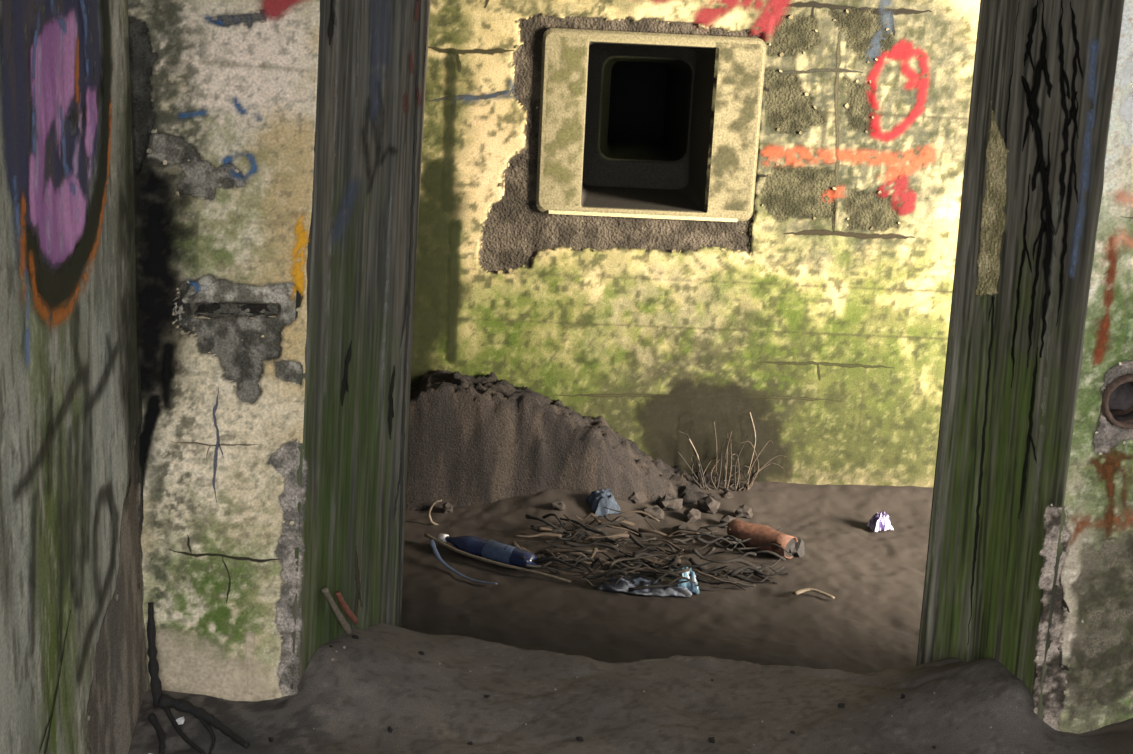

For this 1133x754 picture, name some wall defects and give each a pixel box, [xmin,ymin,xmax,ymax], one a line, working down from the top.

peeling [128,16,246,200]
spalling [479,9,900,274]
damp [122,142,174,510]
spalling [174,275,303,404]
spalling [267,438,308,697]
crack [967,0,1083,645]
peeling [1032,504,1133,731]
rust [1072,451,1133,541]
spalling [1093,361,1133,455]